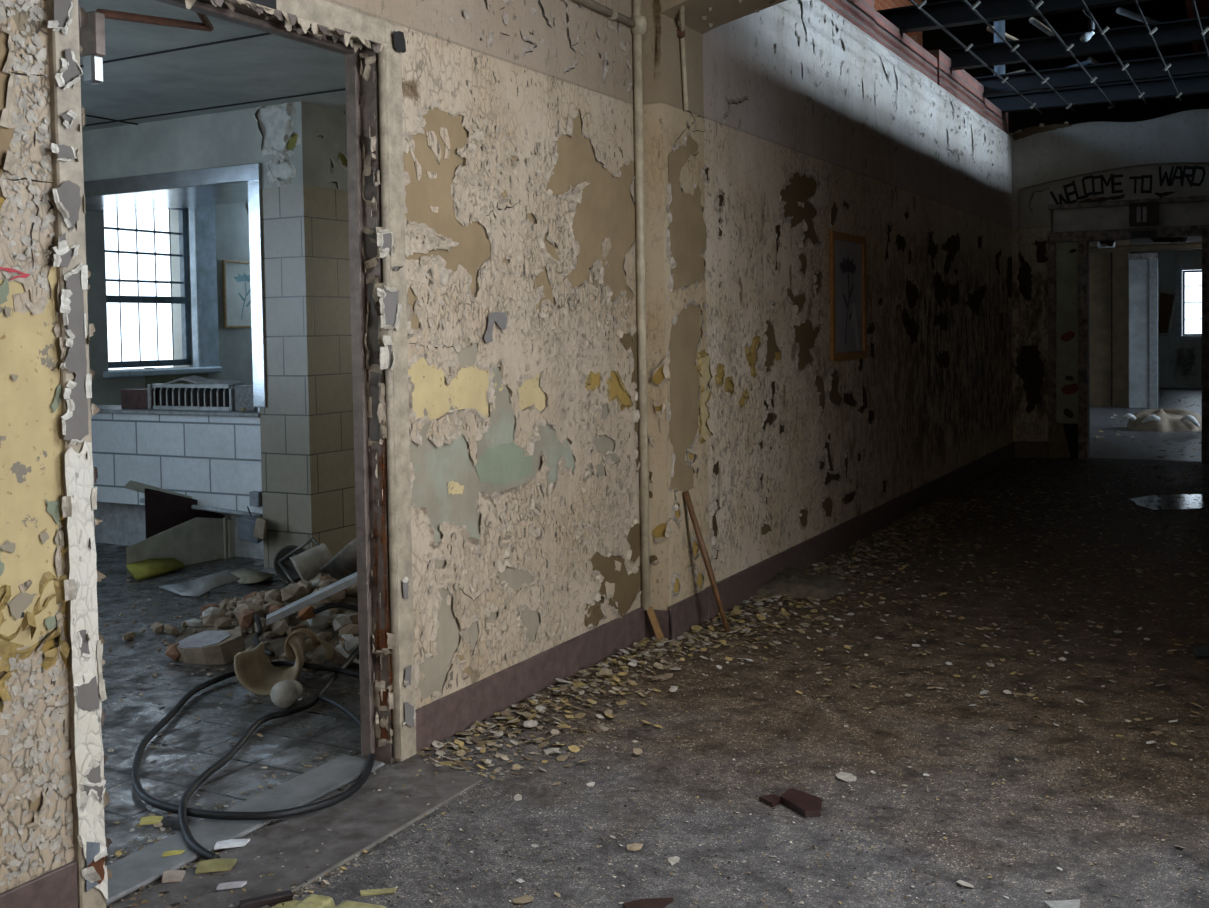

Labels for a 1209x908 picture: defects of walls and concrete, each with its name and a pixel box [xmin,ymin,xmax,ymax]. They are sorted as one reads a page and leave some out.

peeling [185,0,389,106]
crack [480,0,632,93]
peeling [253,102,301,188]
peeling [878,207,987,369]
peeling [995,241,1048,333]
peeling [145,367,210,388]
peeling [0,0,113,900]
peeling [337,100,875,755]
spalling [759,788,822,818]
peeling [836,772,856,782]